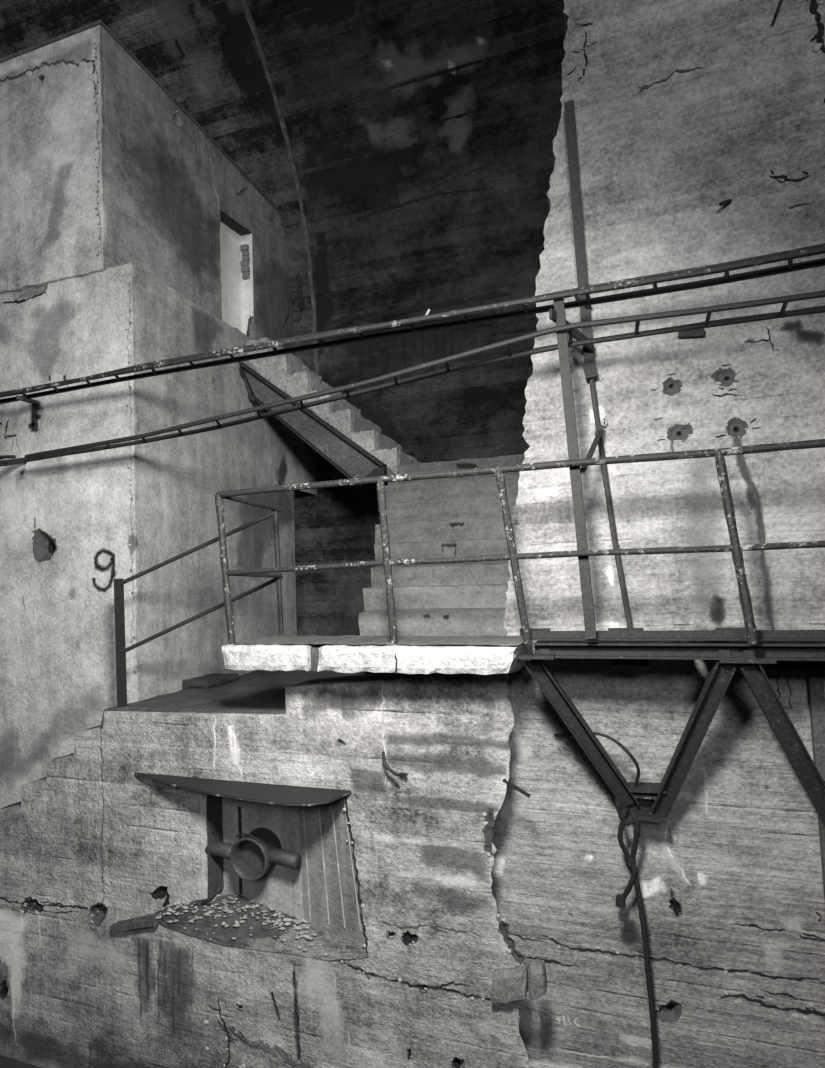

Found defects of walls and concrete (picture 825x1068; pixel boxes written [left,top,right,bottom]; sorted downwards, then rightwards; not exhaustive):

crack [810,0,825,52]
spalling [651,373,683,396]
spalling [710,364,741,391]
spalling [654,417,693,452]
spalling [716,417,760,438]
spalling [32,517,60,564]
crack [339,798,491,1001]
crack [735,912,825,941]
damp [0,910,145,1068]
damp [138,941,155,1017]
crack [509,932,825,1021]
crack [208,993,238,1068]